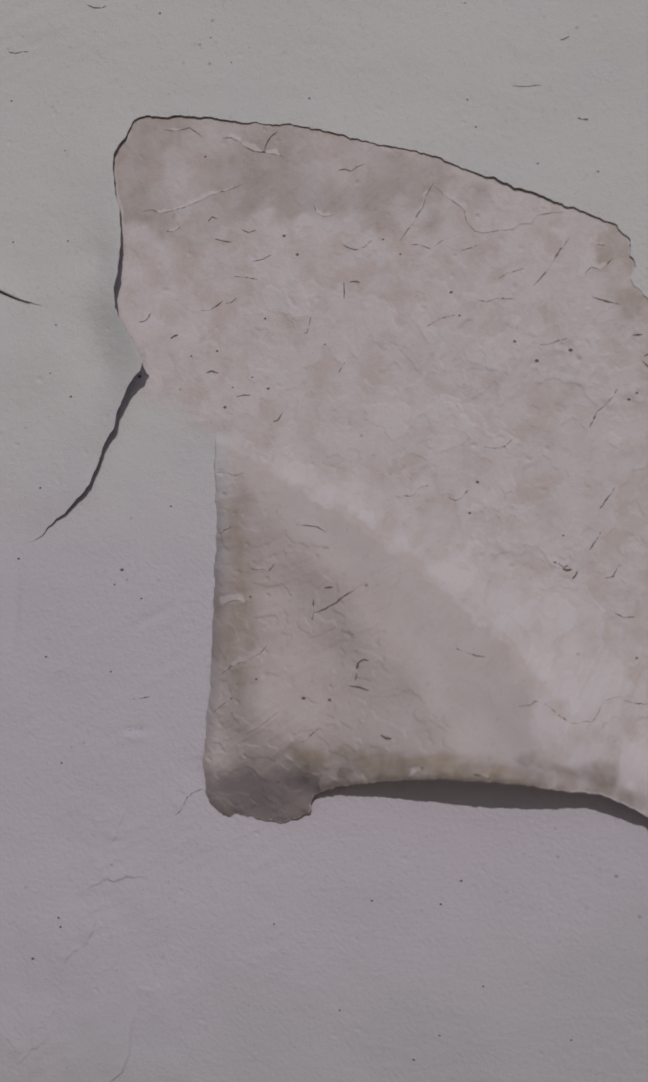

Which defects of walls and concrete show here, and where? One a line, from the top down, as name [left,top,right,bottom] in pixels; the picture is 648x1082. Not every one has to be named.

crack [0,290,39,305]
peeling [0,115,648,823]